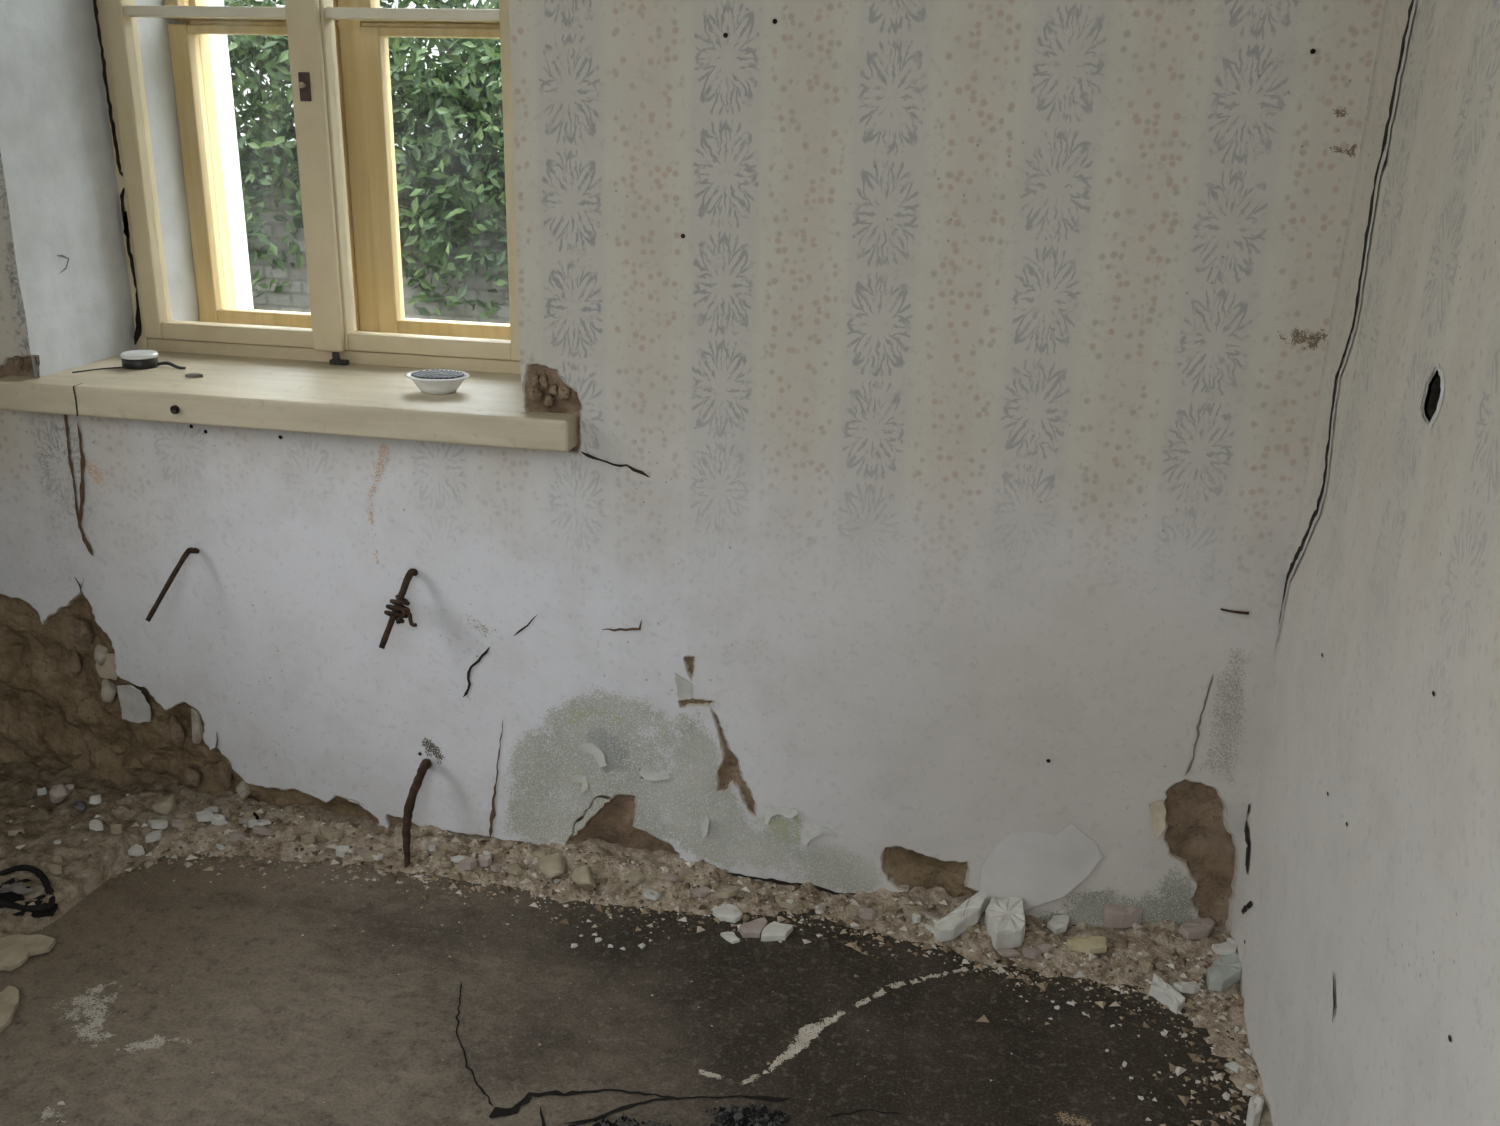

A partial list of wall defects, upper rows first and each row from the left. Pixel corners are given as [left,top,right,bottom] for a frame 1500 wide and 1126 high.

spalling [522,363,582,454]
crack [1273,0,1416,655]
spalling [0,591,424,829]
peeling [446,655,1103,911]
spalling [1149,779,1238,932]
crack [455,982,791,1126]